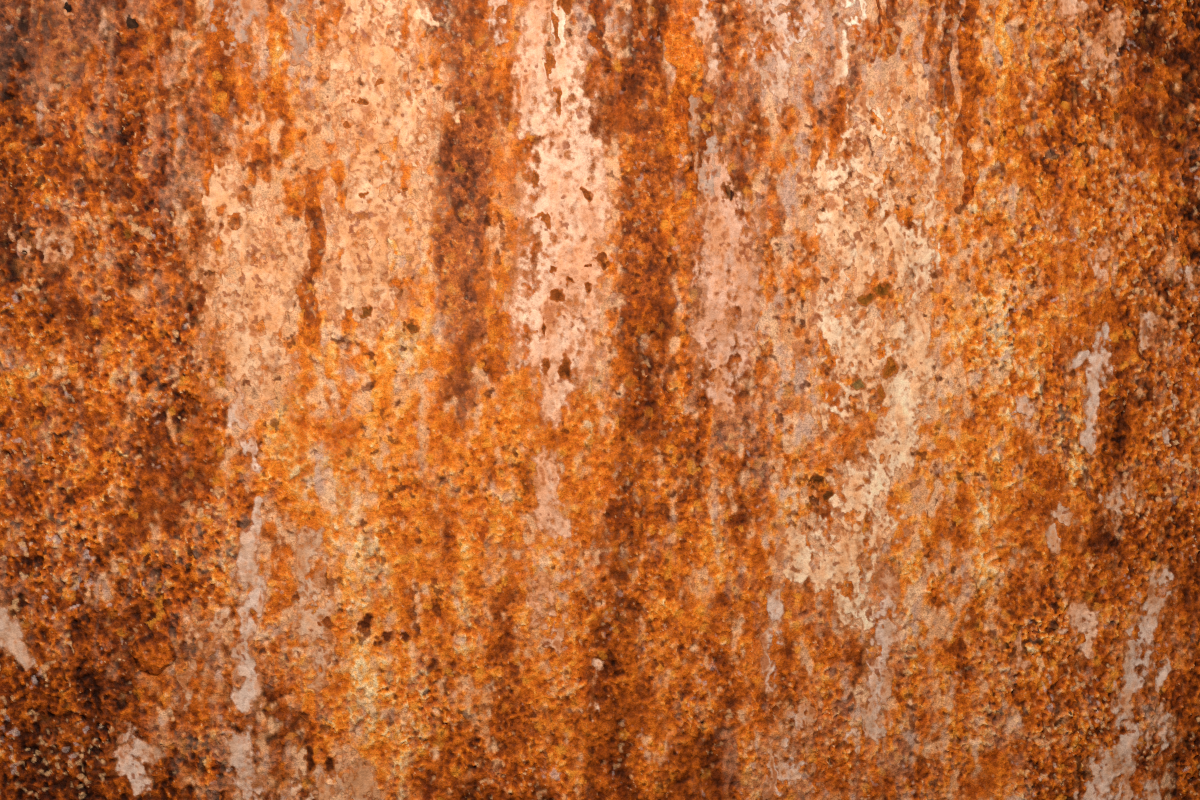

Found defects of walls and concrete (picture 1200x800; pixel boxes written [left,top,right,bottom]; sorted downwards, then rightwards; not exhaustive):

rust [205,0,238,117]
rust [266,26,287,98]
rust [870,0,902,63]
rust [922,0,1038,203]
rust [296,168,327,349]
rust [417,0,558,504]
rust [0,359,33,415]
rust [185,373,226,489]
rust [277,373,308,495]
rust [323,419,360,514]
rust [573,0,703,800]
rust [132,632,176,675]